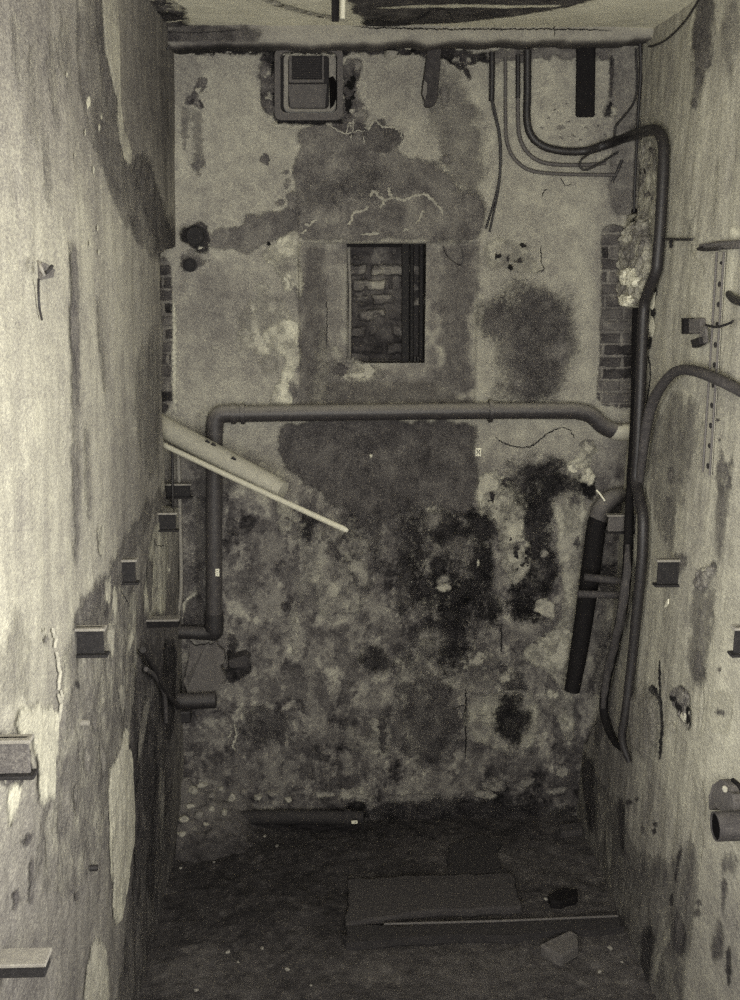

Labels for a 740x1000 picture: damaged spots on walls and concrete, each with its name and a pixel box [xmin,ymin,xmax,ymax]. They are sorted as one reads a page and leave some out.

leakage [70,243,93,559]
leakage [12,0,175,259]
leakage [208,194,300,254]
leakage [477,281,578,403]
flaking render [584,46,657,408]
leakage [278,419,596,763]
leakage [688,588,713,682]
leakage [372,752,701,1000]
leakage [711,920,730,986]
leakage [721,856,736,909]